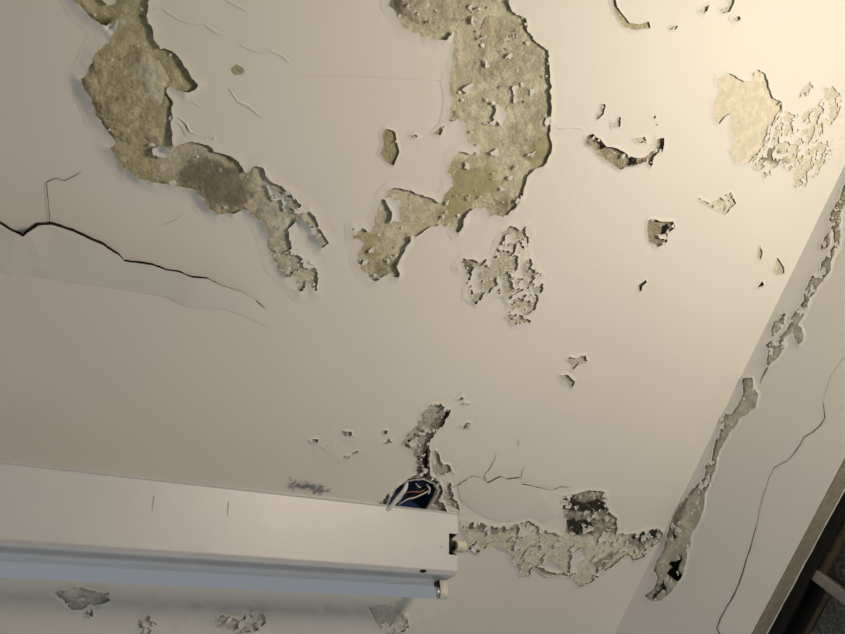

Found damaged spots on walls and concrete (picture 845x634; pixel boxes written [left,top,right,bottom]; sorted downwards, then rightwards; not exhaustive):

crack [0,172,262,306]
peeling [60,0,559,330]
spalling [593,101,622,130]
flaking render [582,112,668,173]
flaking render [644,215,678,251]
spalling [696,189,737,217]
peeling [710,65,843,193]
peeling [762,173,845,370]
crack [454,456,562,490]
peeling [376,374,762,605]
crack [716,358,844,634]
peeling [52,582,119,621]